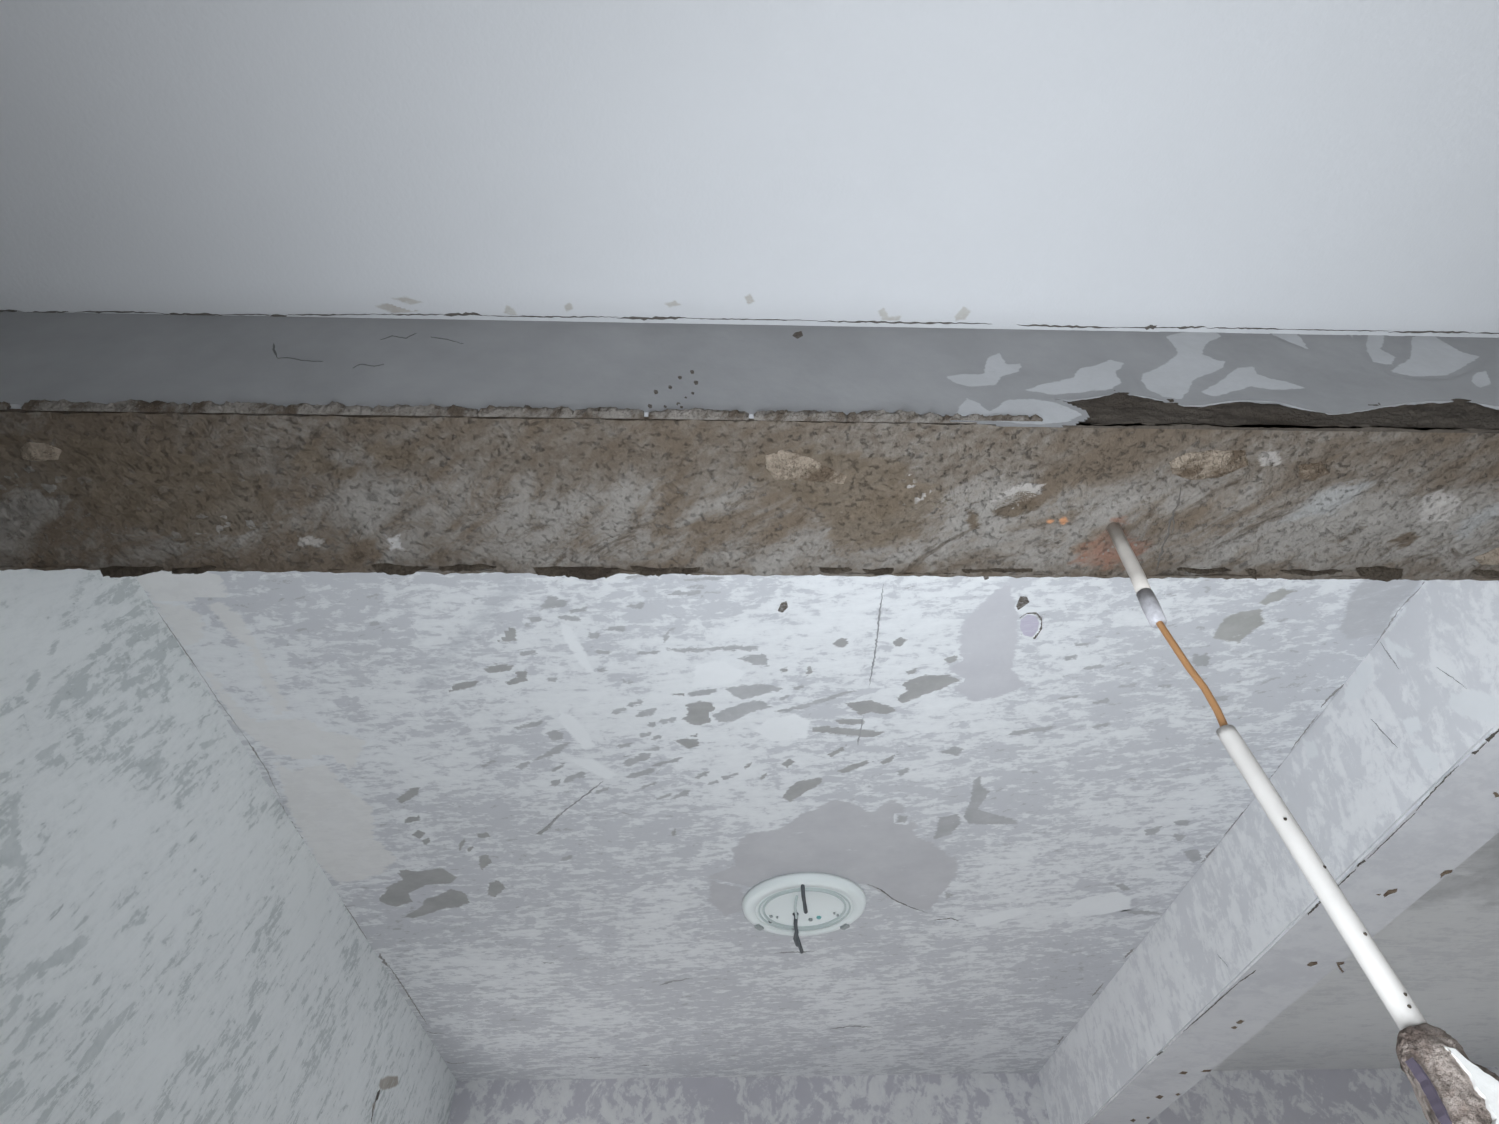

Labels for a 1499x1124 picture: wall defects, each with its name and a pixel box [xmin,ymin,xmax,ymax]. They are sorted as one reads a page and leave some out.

spalling [0,332,1499,433]
spalling [1169,450,1249,480]
peeling [1014,595,1032,612]
flaking render [445,566,968,804]
flaking render [930,773,1024,841]